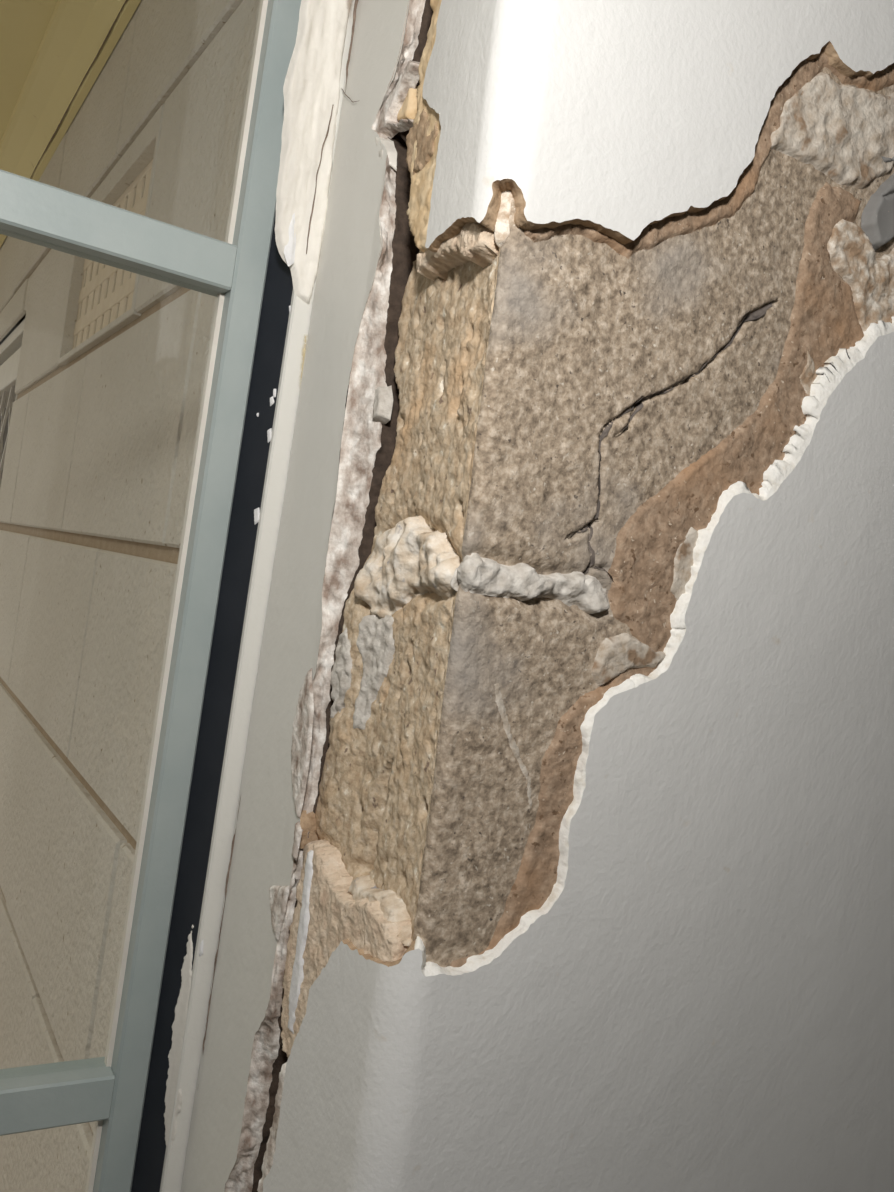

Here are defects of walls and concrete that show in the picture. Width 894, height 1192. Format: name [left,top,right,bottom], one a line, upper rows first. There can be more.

crack [203,797,241,1051]
crack [224,0,433,1192]
spalling [257,0,894,1192]
crack [567,299,777,582]